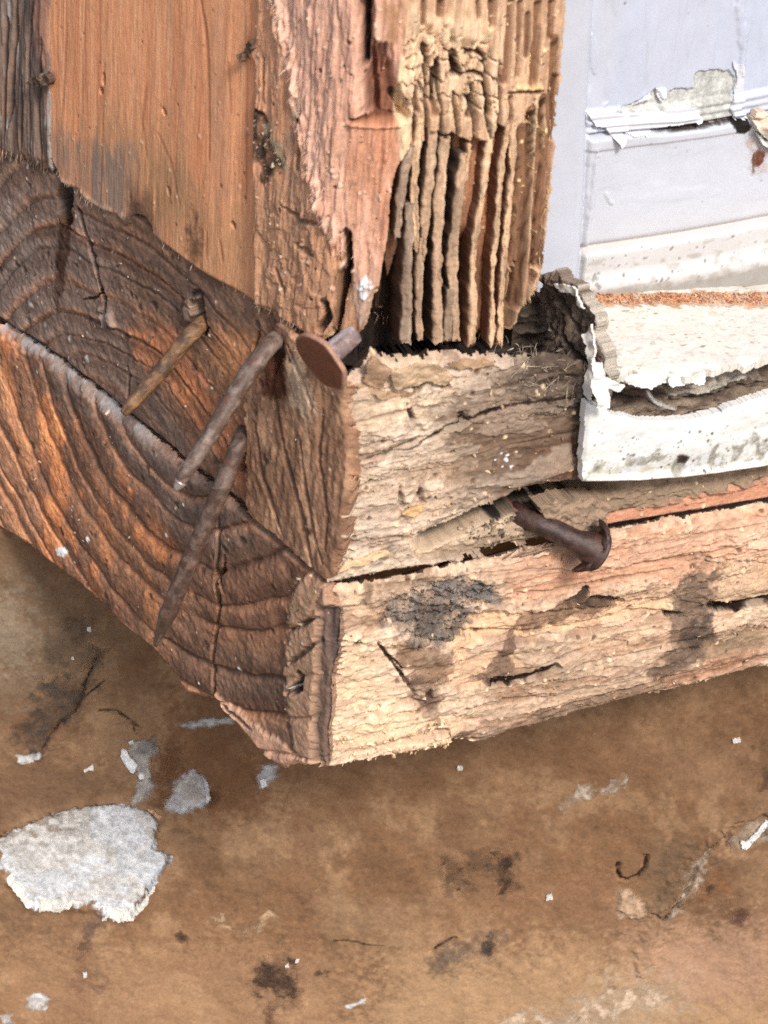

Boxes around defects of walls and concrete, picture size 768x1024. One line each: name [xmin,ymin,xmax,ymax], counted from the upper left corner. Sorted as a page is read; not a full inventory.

peeling [586,62,768,149]
peeling [554,283,586,309]
corrosion [262,351,286,399]
peeling [581,324,706,409]
damp [377,574,505,724]
crack [489,664,555,686]